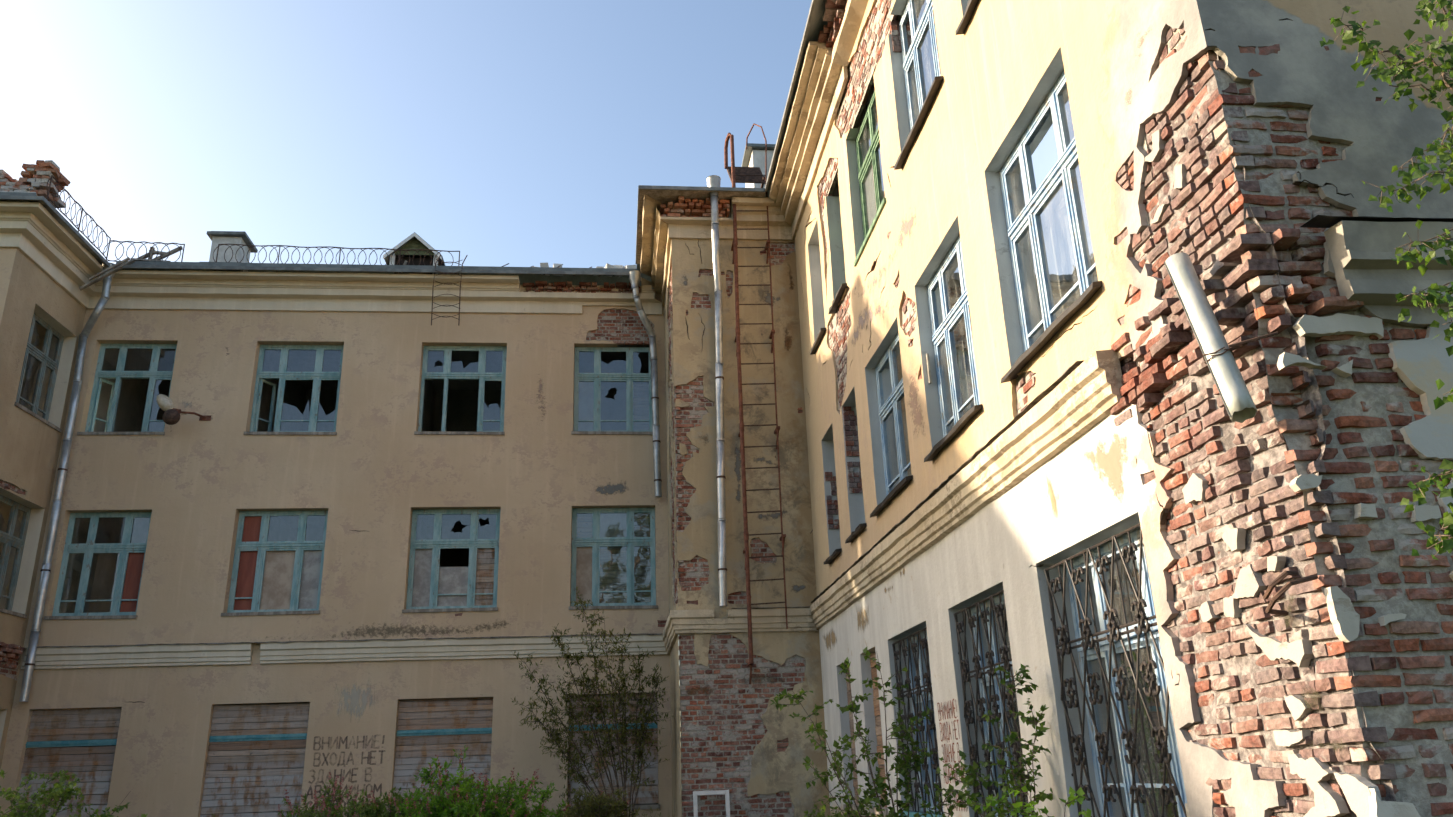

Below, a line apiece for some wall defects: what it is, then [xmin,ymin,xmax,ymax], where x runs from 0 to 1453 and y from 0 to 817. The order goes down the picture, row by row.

spalling [818,0,848,51]
flaking render [836,0,902,137]
flaking render [523,265,733,605]
flaking render [825,288,863,529]
flaking render [1110,26,1453,817]
flaking render [727,592,747,604]
flaking render [657,620,806,817]